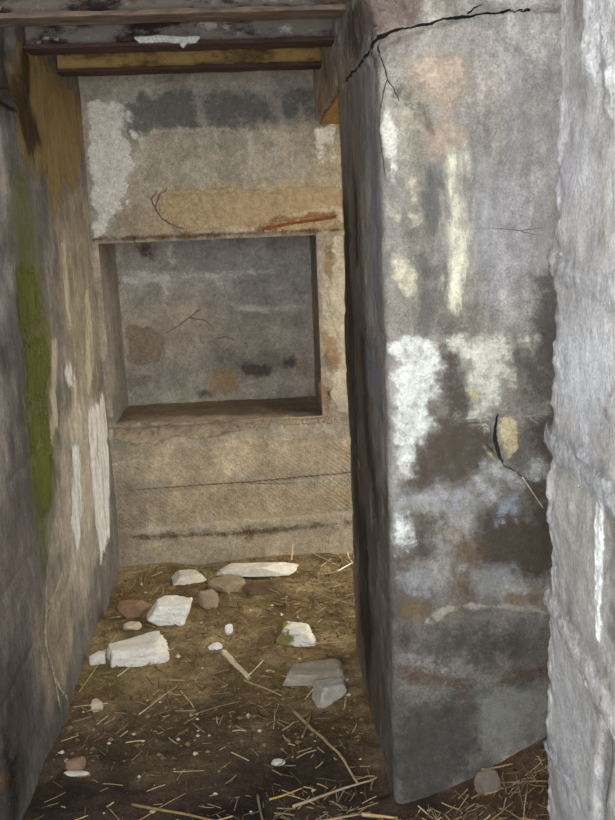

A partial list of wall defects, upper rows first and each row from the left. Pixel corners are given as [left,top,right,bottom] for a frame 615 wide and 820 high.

crack [0,87,18,113]
crack [344,4,531,179]
peeling [86,99,142,238]
corrosion [121,212,335,240]
damp [393,259,416,296]
damp [388,266,557,601]
crack [490,411,554,477]